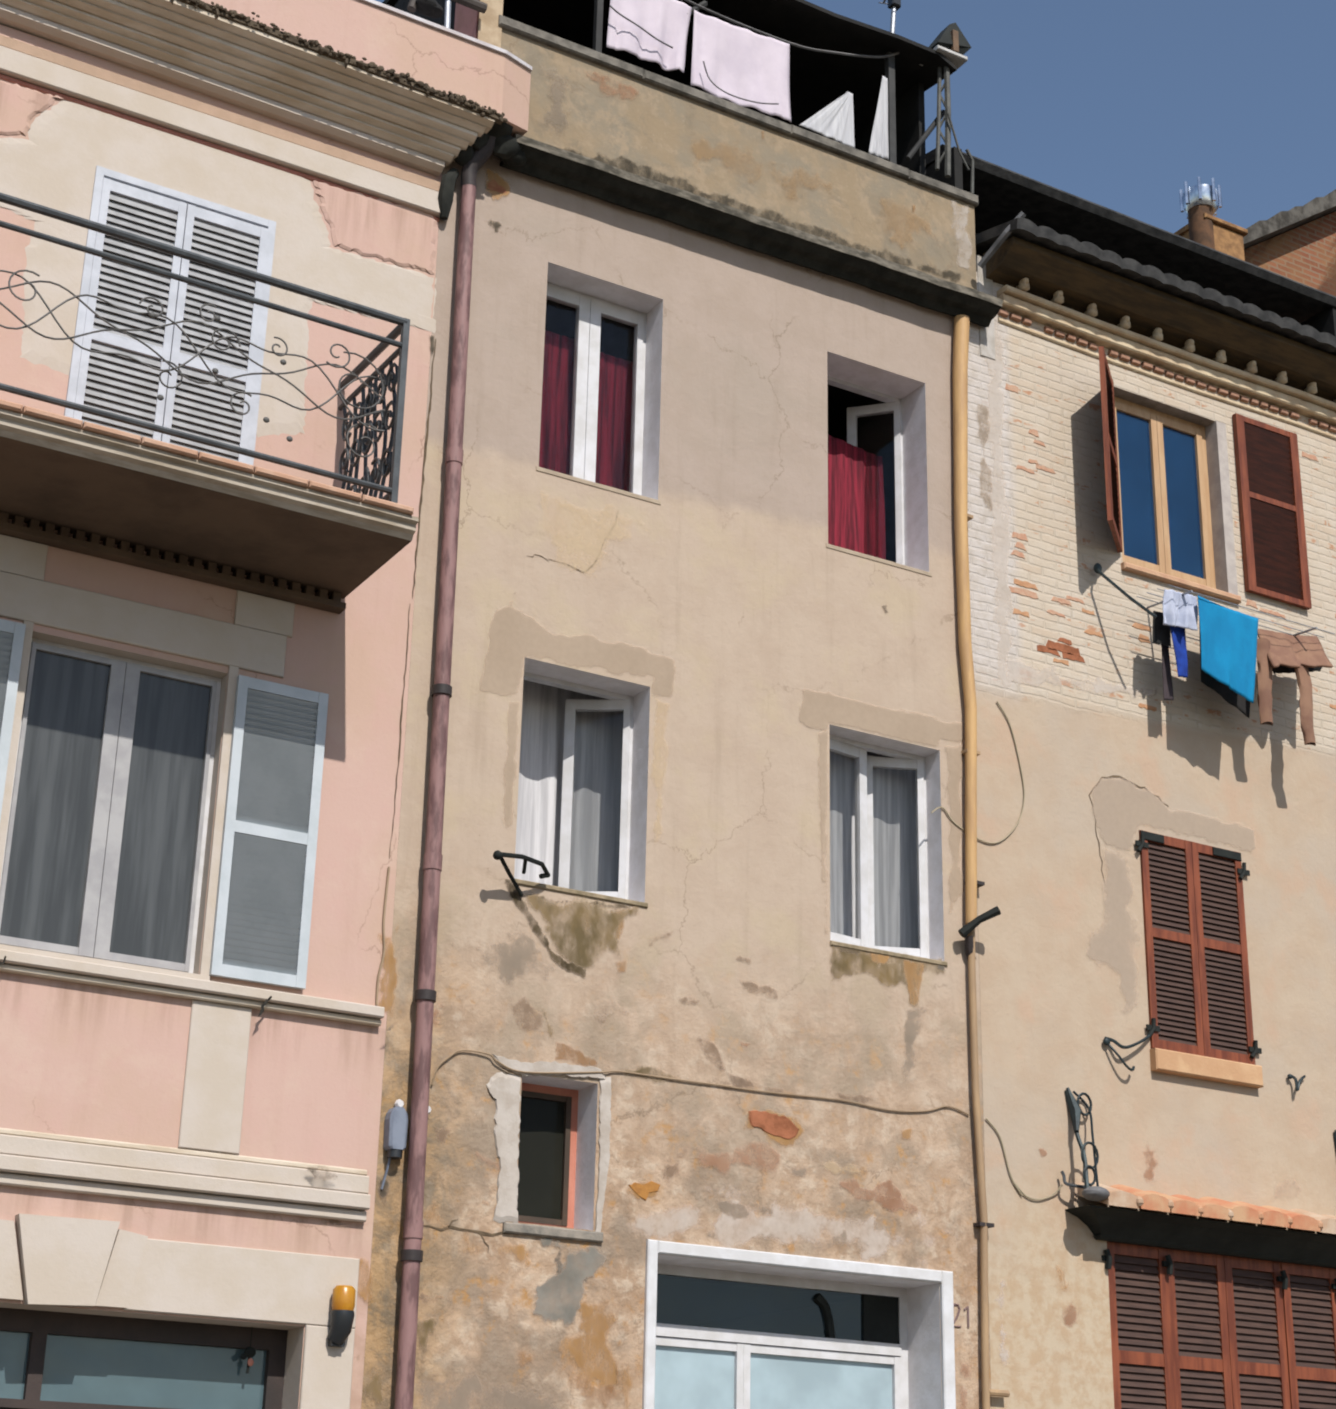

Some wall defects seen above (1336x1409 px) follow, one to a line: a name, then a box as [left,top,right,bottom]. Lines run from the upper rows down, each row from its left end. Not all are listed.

peeling [0,81,64,136]
peeling [313,180,437,274]
leakage [565,149,960,282]
crack [530,513,618,573]
flaking render [1009,578,1103,666]
leakage [486,879,637,983]
peeling [1088,853,1139,1012]
leakage [831,946,945,1072]
flaking render [747,1110,803,1146]
peeling [628,1162,921,1260]